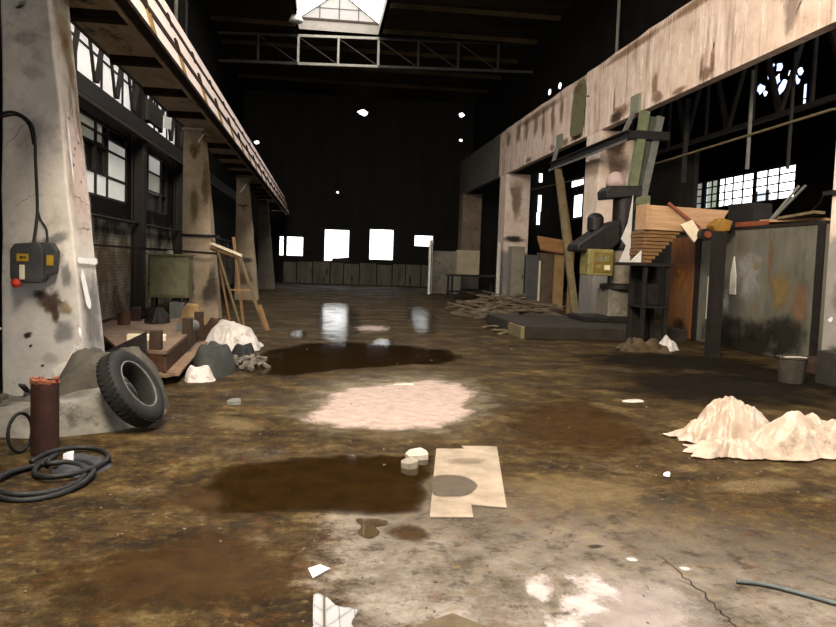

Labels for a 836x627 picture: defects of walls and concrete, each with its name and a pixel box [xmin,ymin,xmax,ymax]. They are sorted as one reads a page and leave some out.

water stain [786,0,797,29]
rust [34,285,71,321]
efflorescence [526,575,552,601]
efflorescence [545,575,687,627]
crack [656,553,753,627]